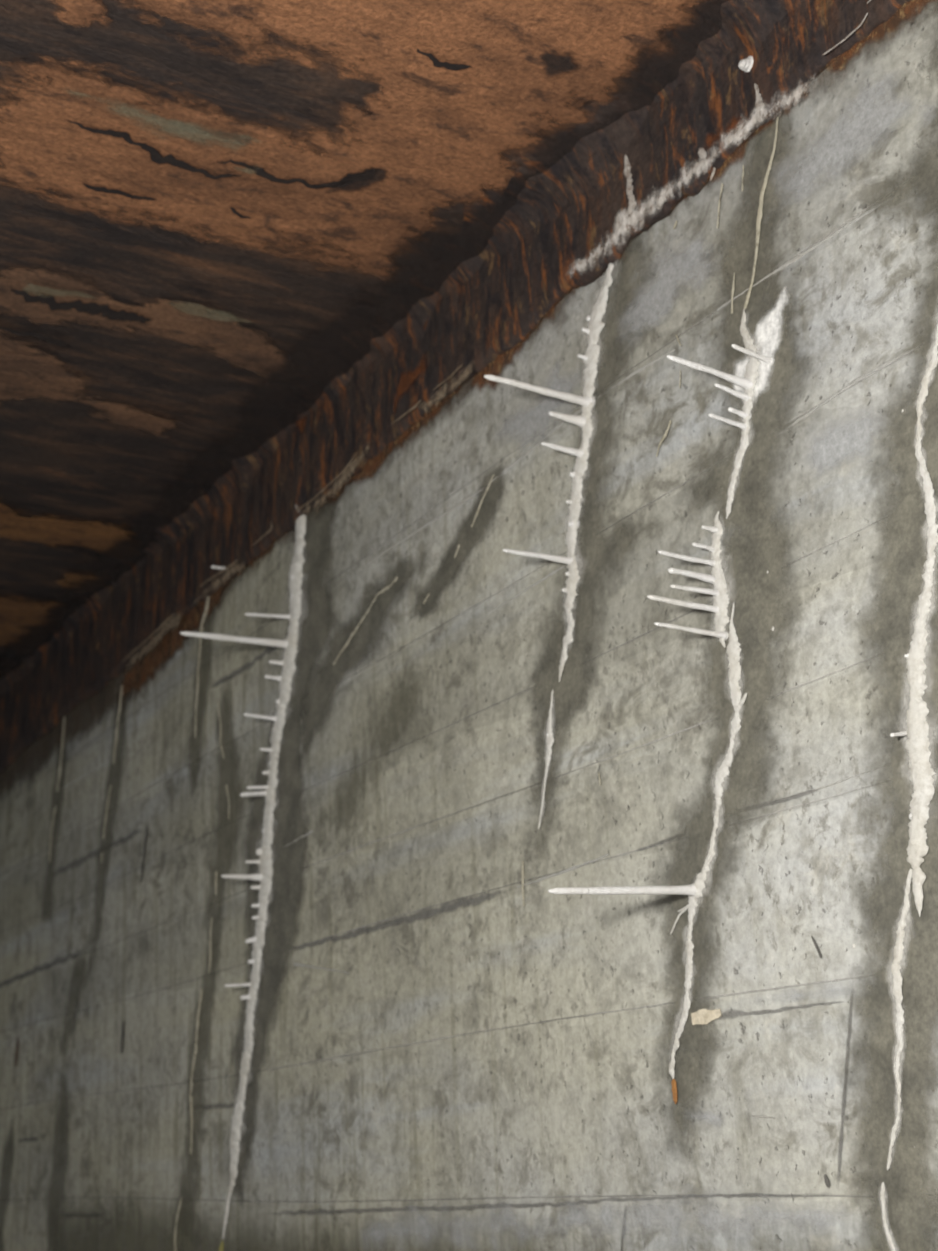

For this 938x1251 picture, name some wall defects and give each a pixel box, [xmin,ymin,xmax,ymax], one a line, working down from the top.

leakage [0,613,181,1046]
rust [0,267,287,437]
rust [120,539,276,696]
crack [180,515,306,1251]
rust [0,0,708,277]
leakage [0,0,726,679]
rust [324,302,556,504]
crack [484,263,614,830]
crack [521,117,778,1104]
leakage [533,56,903,1143]
leakage [850,258,938,1251]
crack [880,323,938,1251]